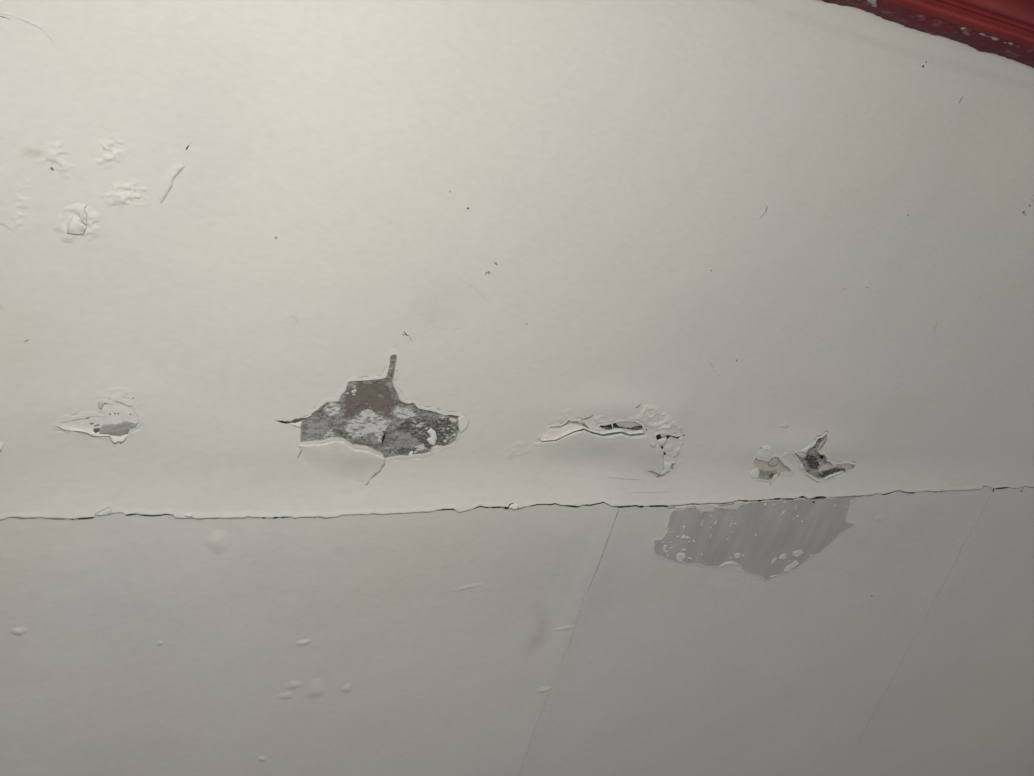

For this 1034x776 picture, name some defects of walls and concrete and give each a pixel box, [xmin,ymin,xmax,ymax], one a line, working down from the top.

spalling [51,387,144,443]
spalling [275,349,469,485]
flaking render [501,404,685,480]
spalling [750,432,856,485]
crack [0,483,1034,664]
peeling [651,497,858,582]